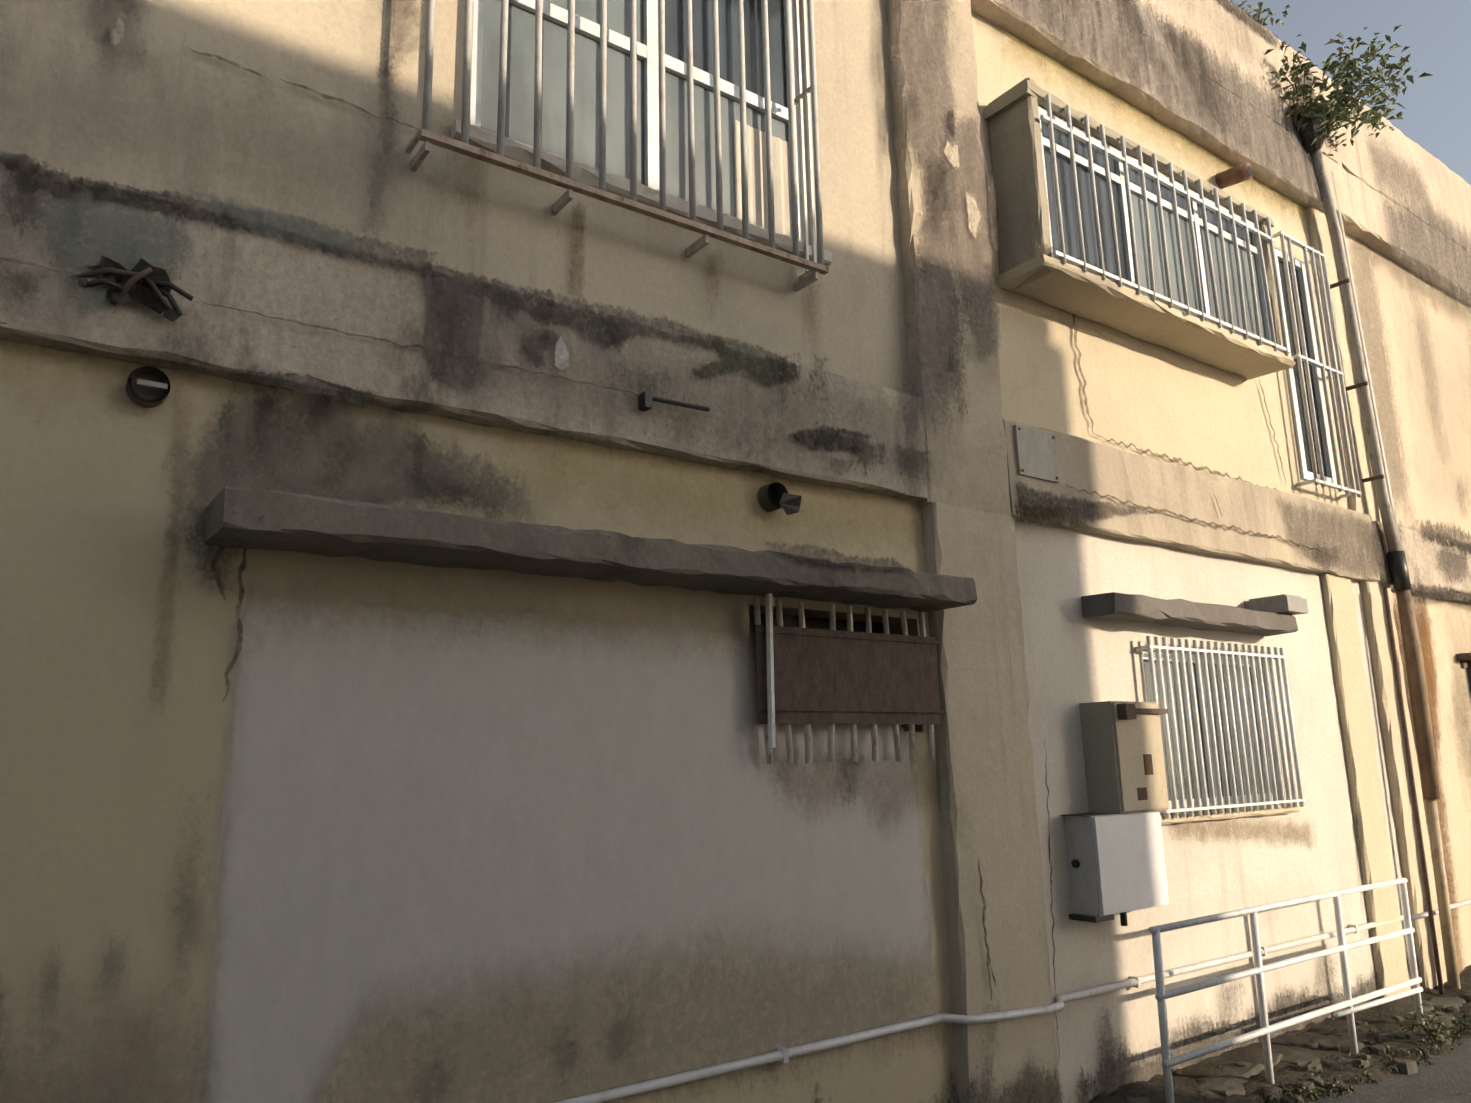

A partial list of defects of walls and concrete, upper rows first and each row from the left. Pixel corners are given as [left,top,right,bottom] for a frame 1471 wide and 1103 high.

crack [186,47,418,130]
leakage [998,0,1323,207]
leakage [0,151,724,386]
leakage [791,0,969,481]
leakage [1032,242,1268,346]
leakage [184,368,531,590]
leakage [936,963,1381,1103]